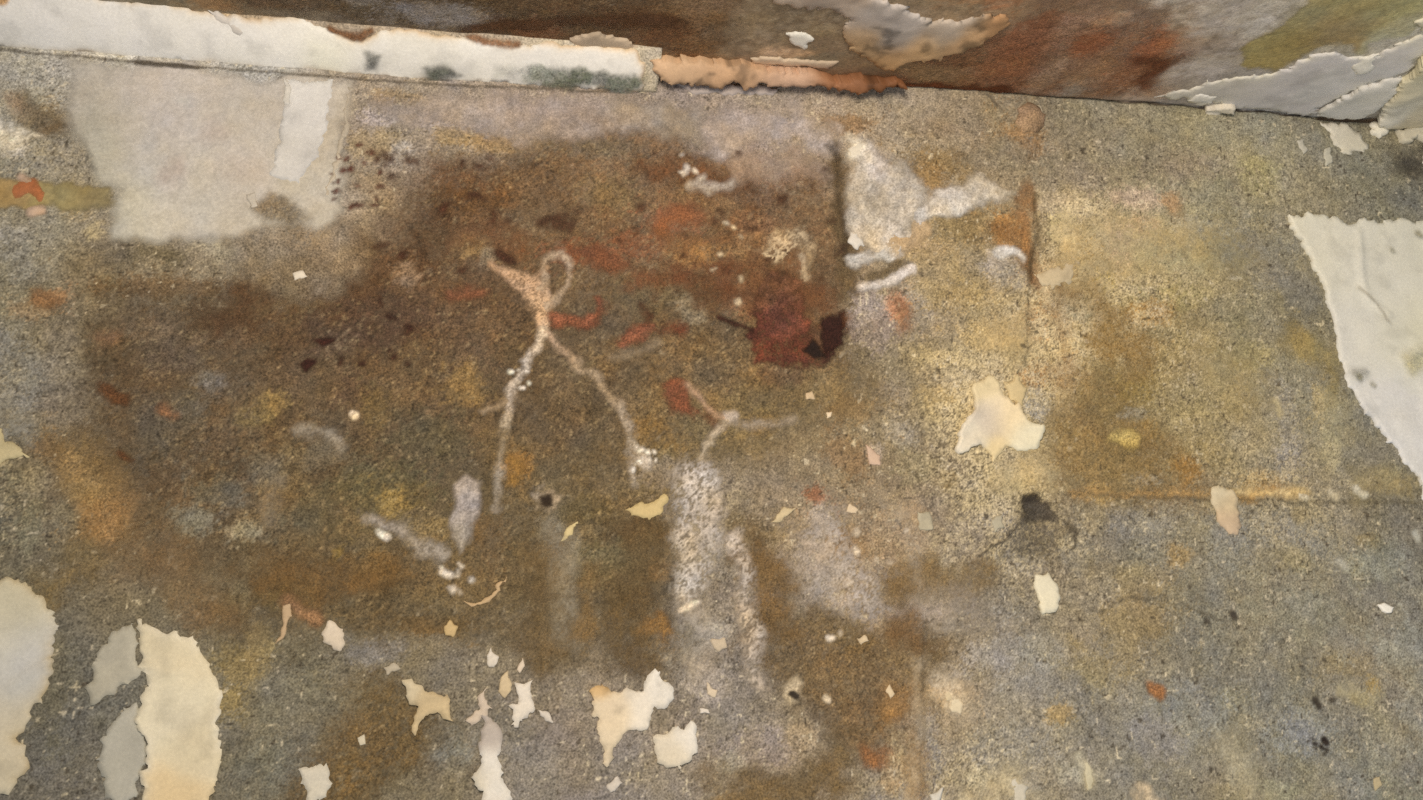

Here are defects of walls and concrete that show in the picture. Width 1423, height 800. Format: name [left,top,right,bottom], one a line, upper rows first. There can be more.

peeling [0,0,1015,301]
corrosion [884,14,1190,97]
peeling [1154,18,1423,166]
water stain [62,65,994,800]
corrosion [717,251,846,367]
peeling [955,374,1045,462]
peeling [1287,211,1423,500]
peeling [626,494,669,520]
peeling [0,576,59,795]
peeling [85,618,223,800]
peeling [298,763,332,800]
peeling [589,669,718,793]